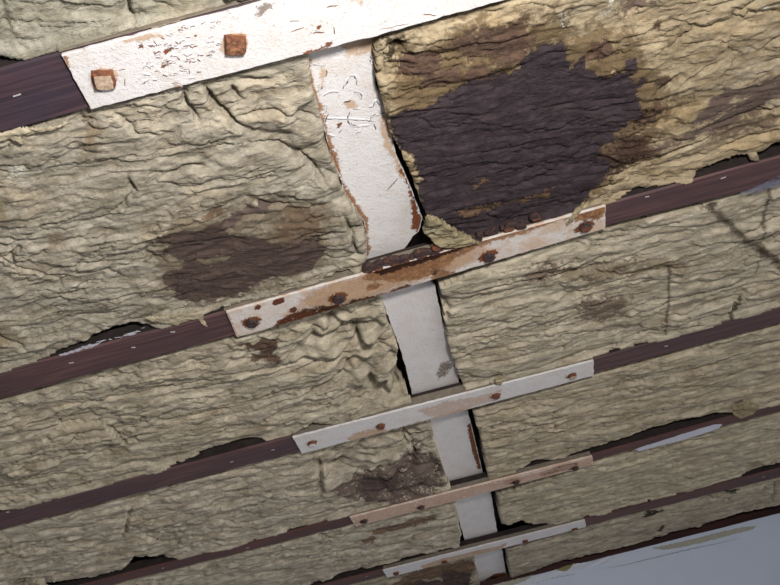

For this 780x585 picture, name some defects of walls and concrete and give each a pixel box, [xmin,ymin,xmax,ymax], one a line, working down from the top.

water stain [380,0,780,237]
rust [272,70,605,327]
water stain [155,199,330,304]
rust [227,304,282,365]
water stain [319,440,447,506]
rust [467,424,481,469]